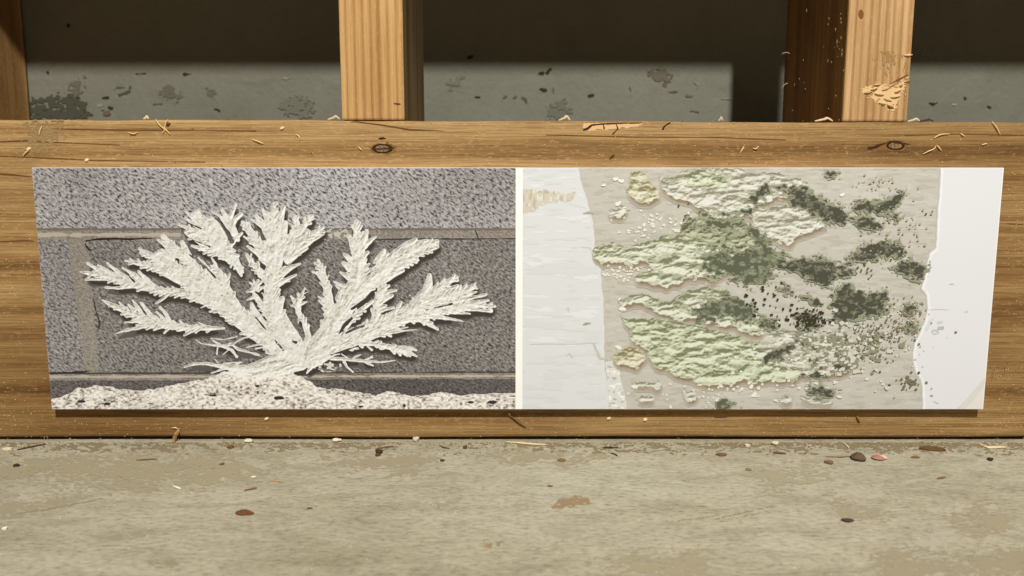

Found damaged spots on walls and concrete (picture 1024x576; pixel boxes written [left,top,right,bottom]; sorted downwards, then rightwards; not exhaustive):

efflorescence [80,202,496,380]
flaking render [523,168,1003,409]
water stain [592,168,957,405]